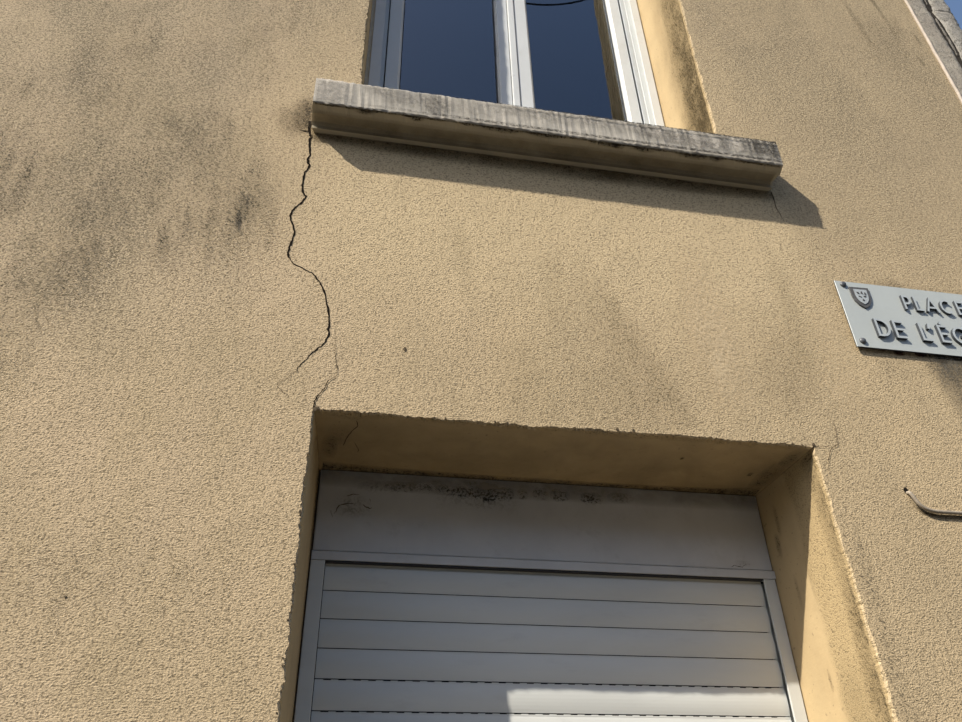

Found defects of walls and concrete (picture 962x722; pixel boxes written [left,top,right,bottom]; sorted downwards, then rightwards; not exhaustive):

crack [277,121,338,407]
leakage [313,443,776,520]